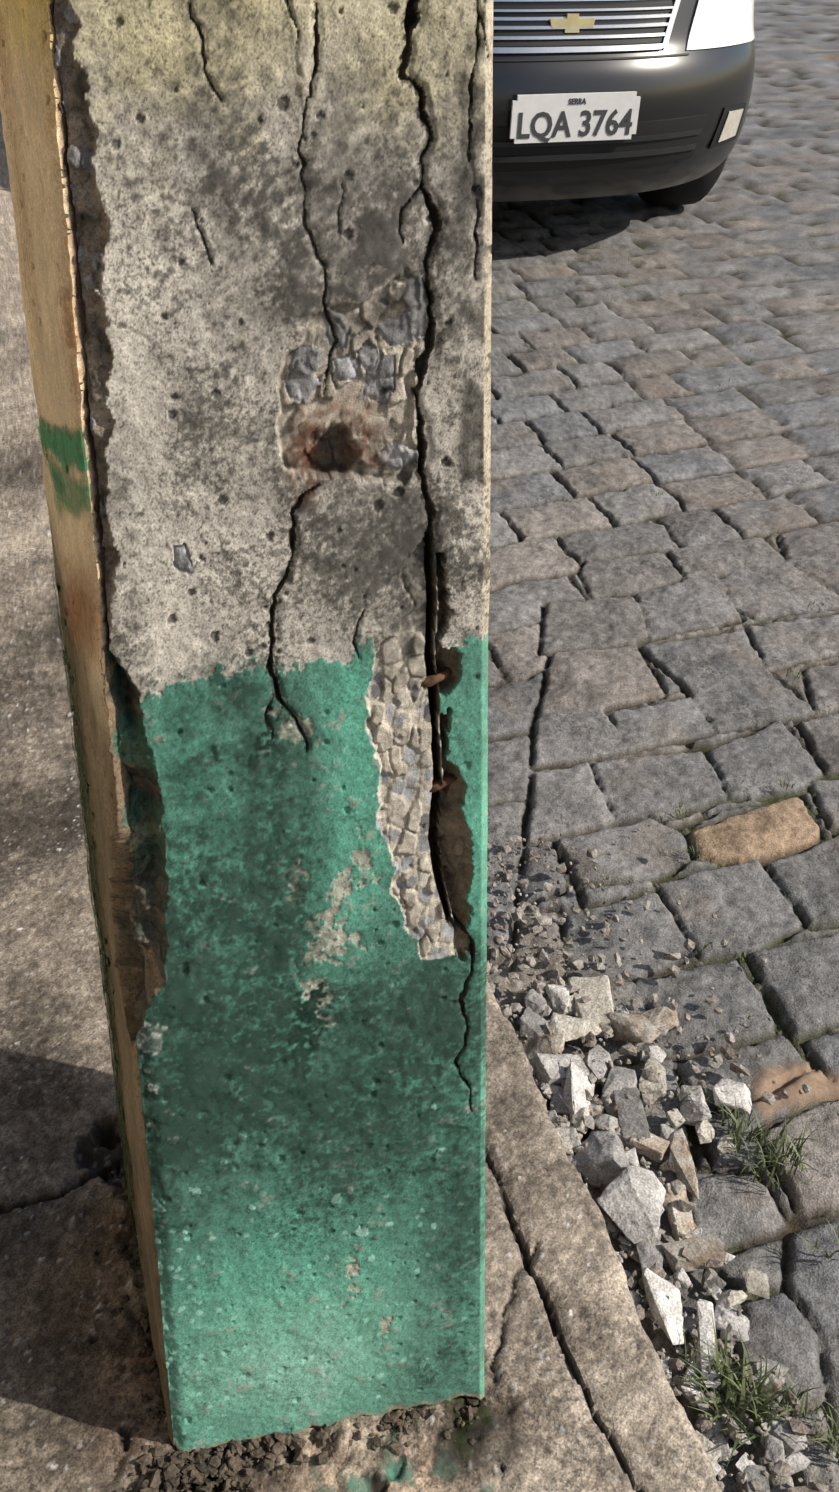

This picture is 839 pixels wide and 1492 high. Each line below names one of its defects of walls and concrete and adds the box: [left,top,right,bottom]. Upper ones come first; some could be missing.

spalling [46,0,170,1046]
crack [263,482,321,751]
corrosion [294,421,319,488]
crack [286,0,345,395]
spalling [283,532,475,1031]
crack [397,0,489,542]
crack [454,926,477,1112]